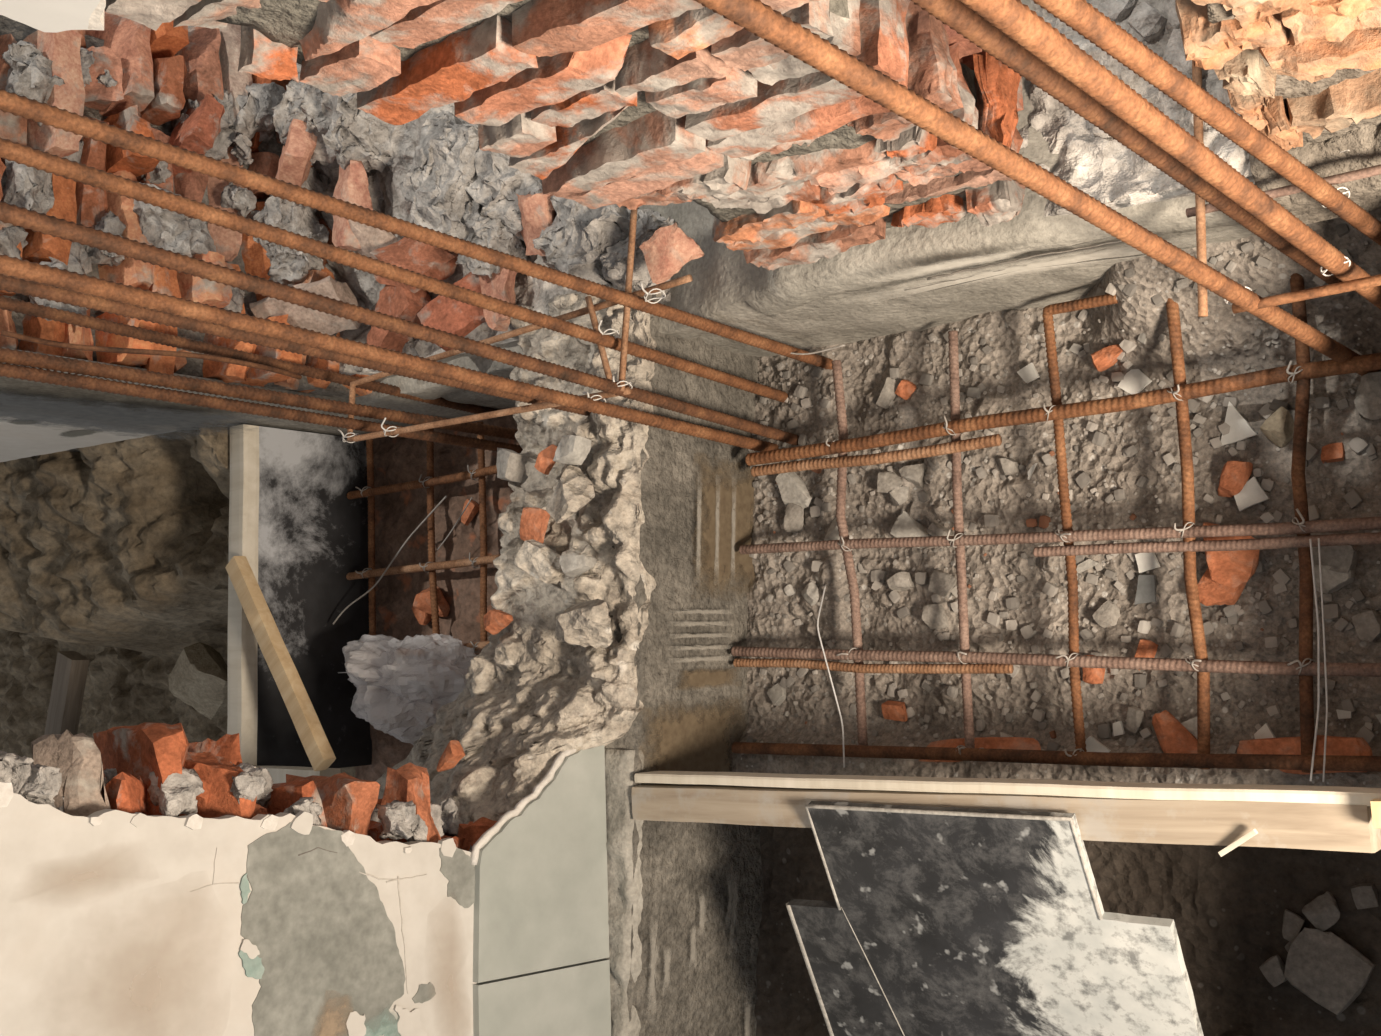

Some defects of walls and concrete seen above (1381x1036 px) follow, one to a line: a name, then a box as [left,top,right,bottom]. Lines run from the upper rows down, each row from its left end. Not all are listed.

spalling [0,0,1381,787]
spalling [0,722,576,1036]
spalling [618,820,764,1036]